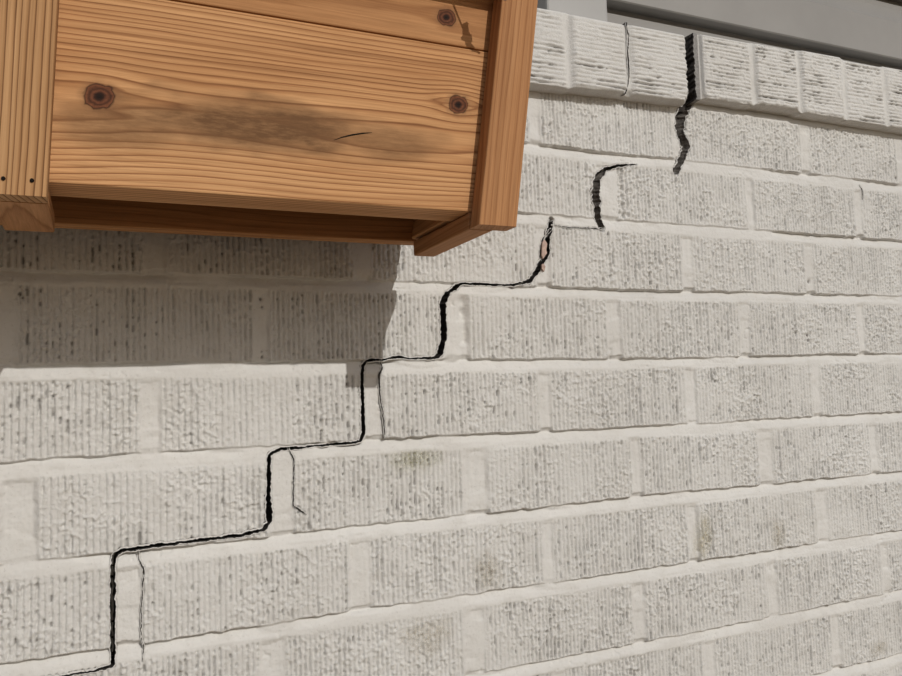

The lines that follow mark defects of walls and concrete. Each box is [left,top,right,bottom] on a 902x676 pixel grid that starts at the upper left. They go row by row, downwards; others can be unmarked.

crack [622,22,630,96]
crack [673,58,692,173]
crack [47,163,636,676]